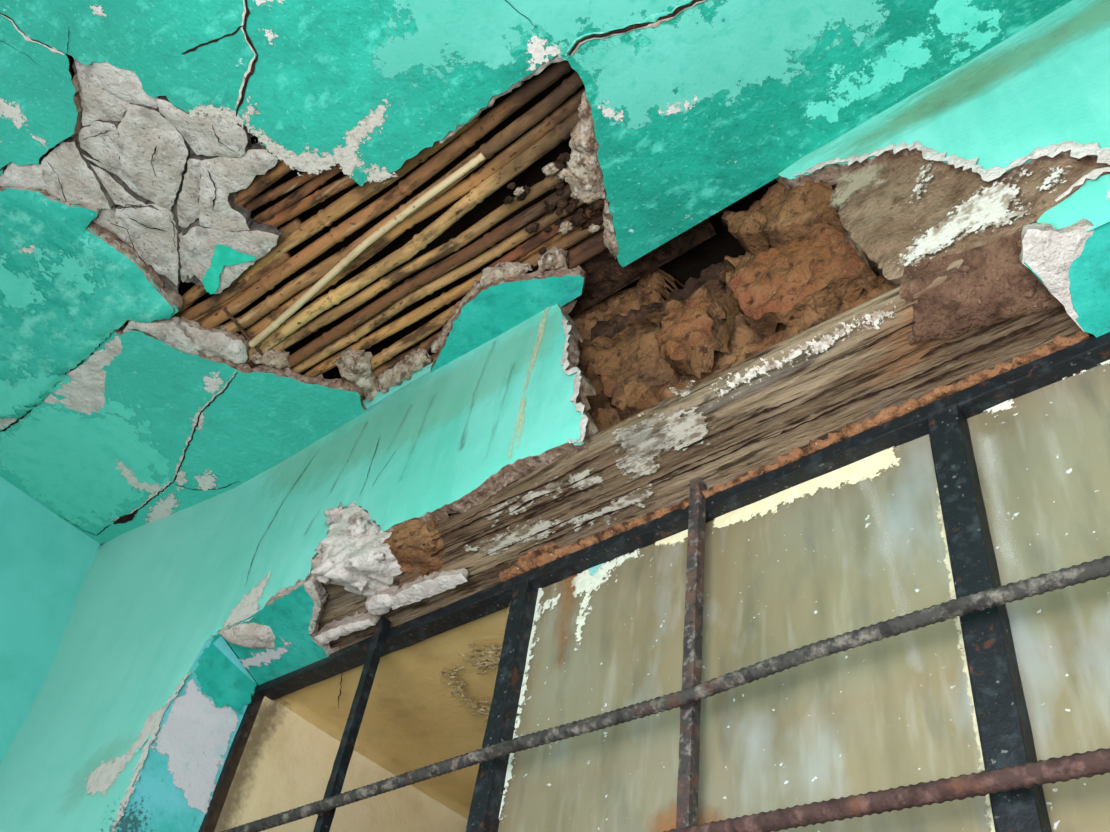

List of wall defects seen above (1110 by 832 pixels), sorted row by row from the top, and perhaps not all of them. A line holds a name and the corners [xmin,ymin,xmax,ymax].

crack [0,13,70,64]
crack [181,0,258,117]
crack [566,0,706,57]
spalling [334,0,1110,444]
peeling [0,316,291,532]
crack [62,371,240,535]
rust [702,330,1092,498]
spalling [303,501,470,646]
rust [499,497,689,582]
peeling [85,572,292,831]
spalling [221,556,1110,832]
rust [657,812,676,832]